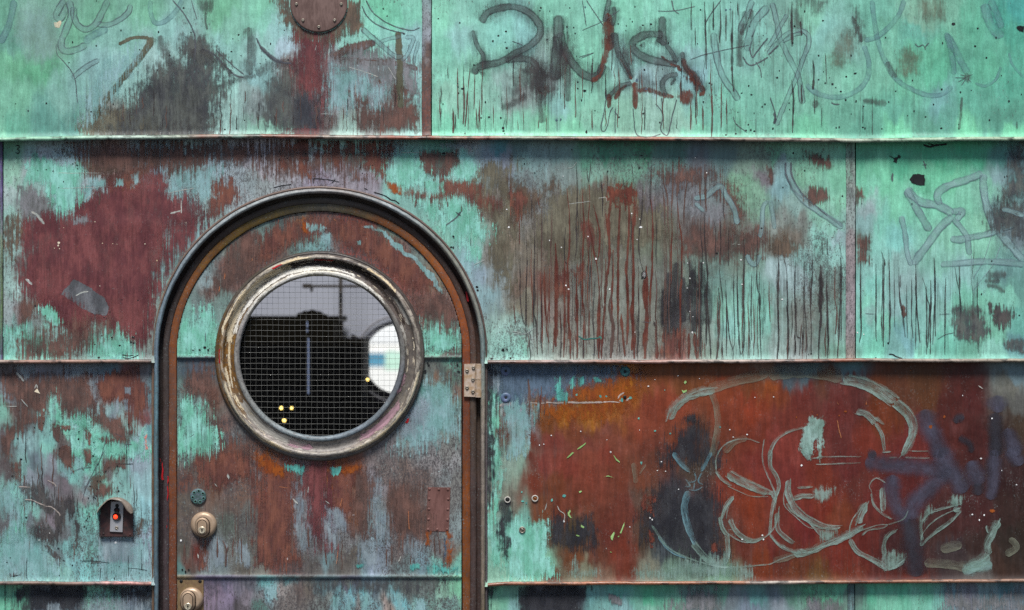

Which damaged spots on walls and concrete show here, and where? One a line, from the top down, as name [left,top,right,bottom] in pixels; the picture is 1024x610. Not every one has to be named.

corrosion [277,29,334,135]
corrosion [387,181,402,195]
corrosion [603,182,637,209]
corrosion [536,373,637,424]
corrosion [496,406,508,454]
corrosion [256,455,361,558]